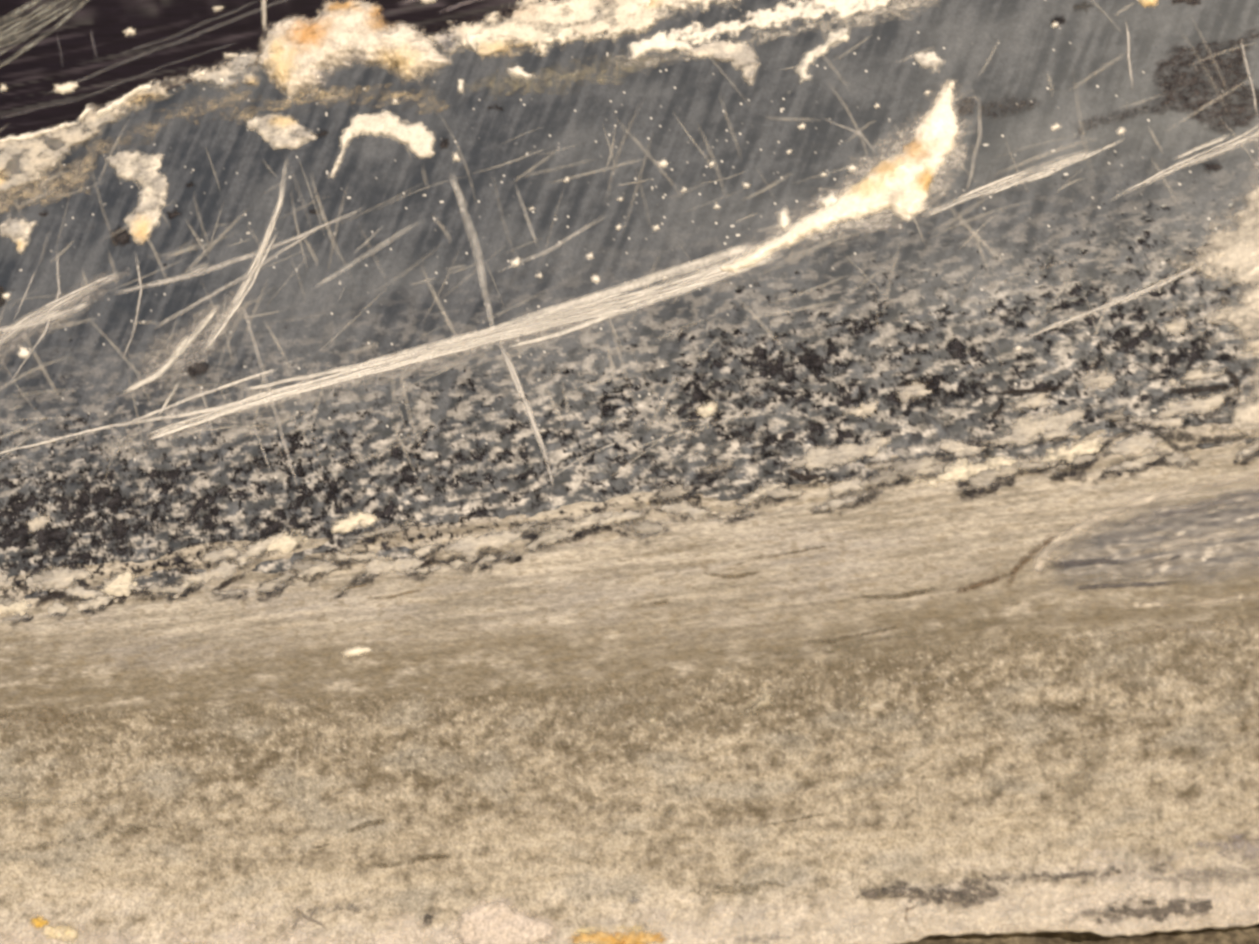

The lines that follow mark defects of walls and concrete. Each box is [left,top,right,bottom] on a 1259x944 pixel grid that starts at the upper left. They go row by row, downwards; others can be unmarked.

peeling [190,53,256,89]
peeling [428,0,888,85]
peeling [914,52,942,69]
peeling [0,79,174,191]
peeling [247,99,459,176]
water stain [0,277,106,344]
water stain [212,197,297,341]
water stain [141,247,764,438]
water stain [1044,261,1206,331]
water stain [1,424,121,453]
water stain [1035,479,1259,582]